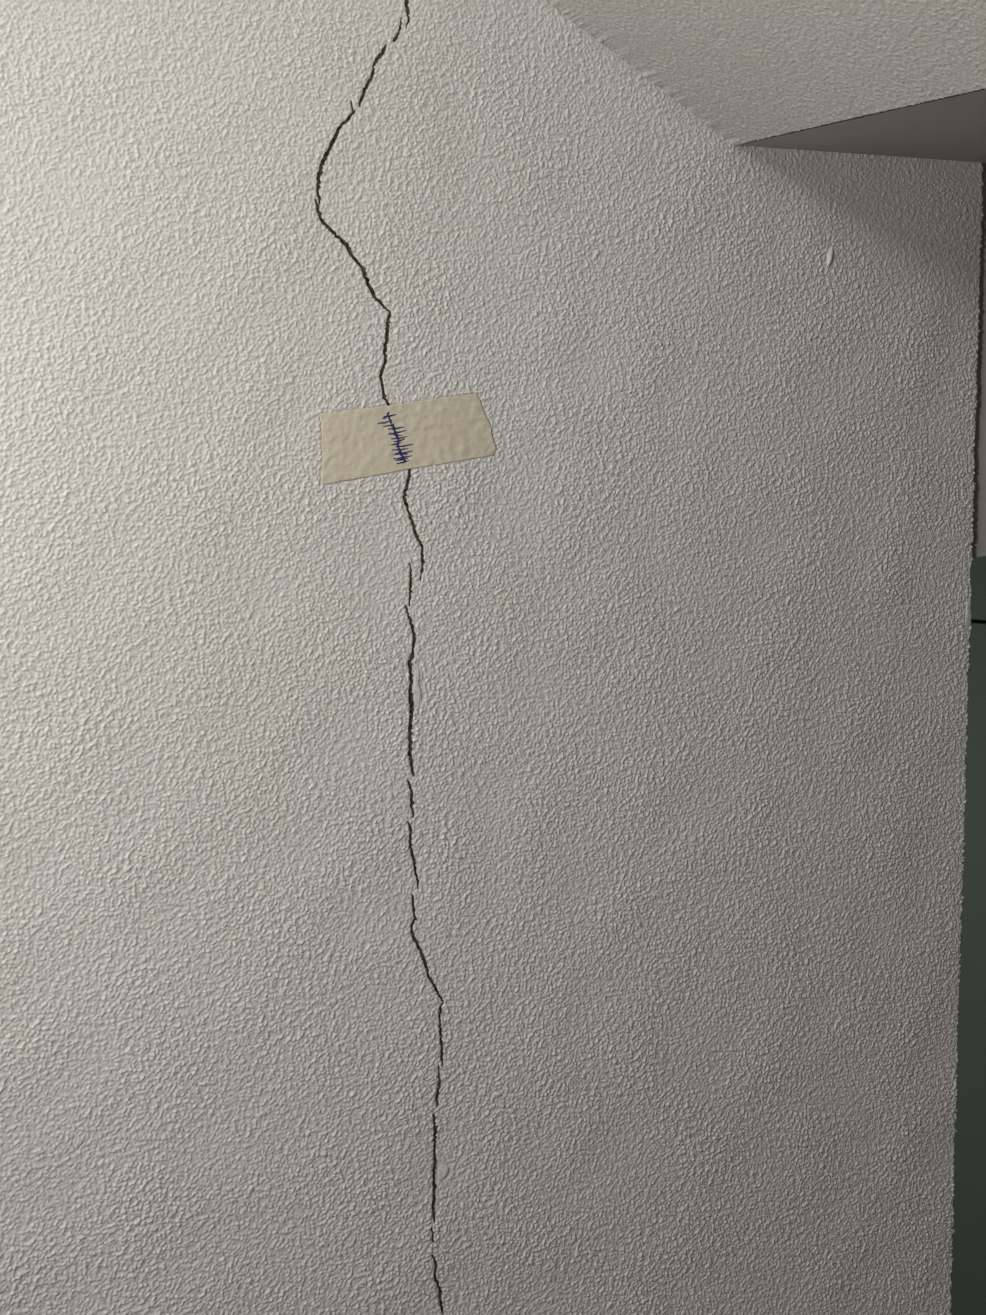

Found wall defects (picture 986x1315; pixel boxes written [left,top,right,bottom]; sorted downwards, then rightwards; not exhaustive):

crack [315,0,410,406]
crack [402,469,444,1315]